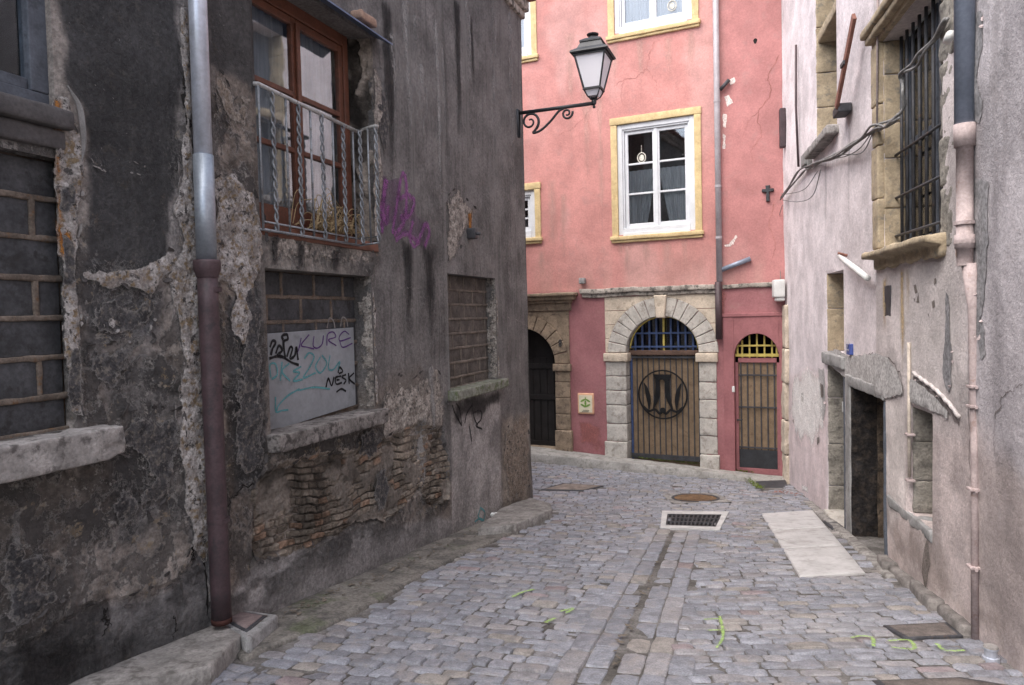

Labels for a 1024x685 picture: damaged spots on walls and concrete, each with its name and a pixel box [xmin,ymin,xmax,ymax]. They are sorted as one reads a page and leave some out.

spalling [52,7,208,608]
spalling [214,69,451,564]
flaking render [446,188,477,261]